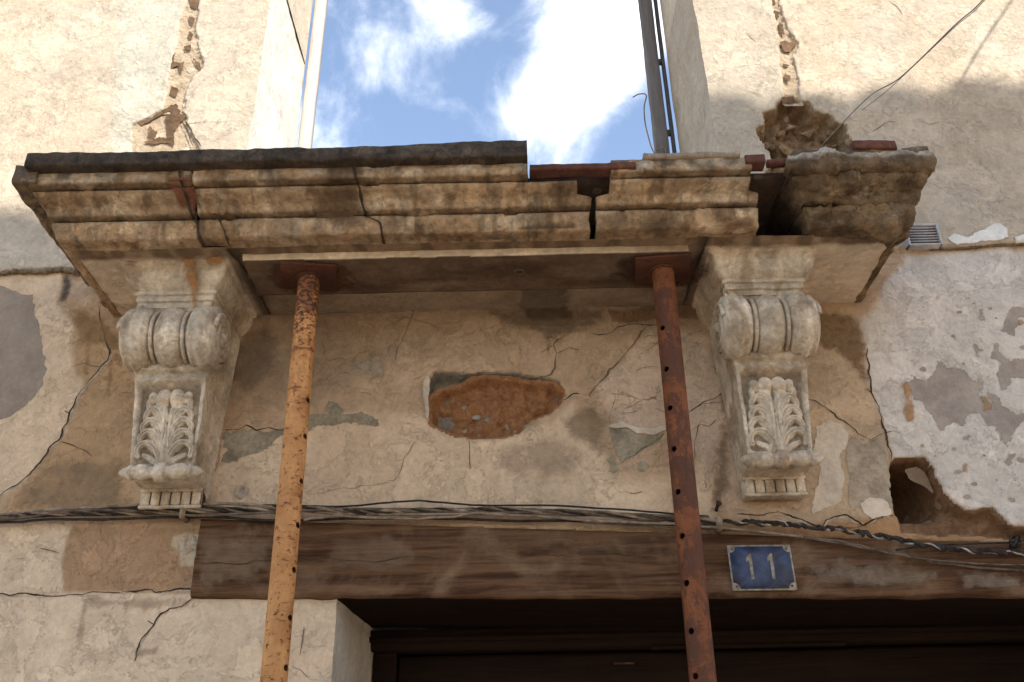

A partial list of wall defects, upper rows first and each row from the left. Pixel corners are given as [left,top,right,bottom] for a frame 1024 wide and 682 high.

crack [351,165,386,244]
peeling [0,286,47,419]
crack [0,306,131,496]
crack [214,425,279,472]
flaking render [221,428,284,463]
flaking render [308,401,379,431]
spalling [423,371,565,439]
crack [540,324,664,460]
crack [809,349,901,459]
spalling [811,419,1024,543]
peeling [906,302,1024,465]
crack [0,588,193,661]